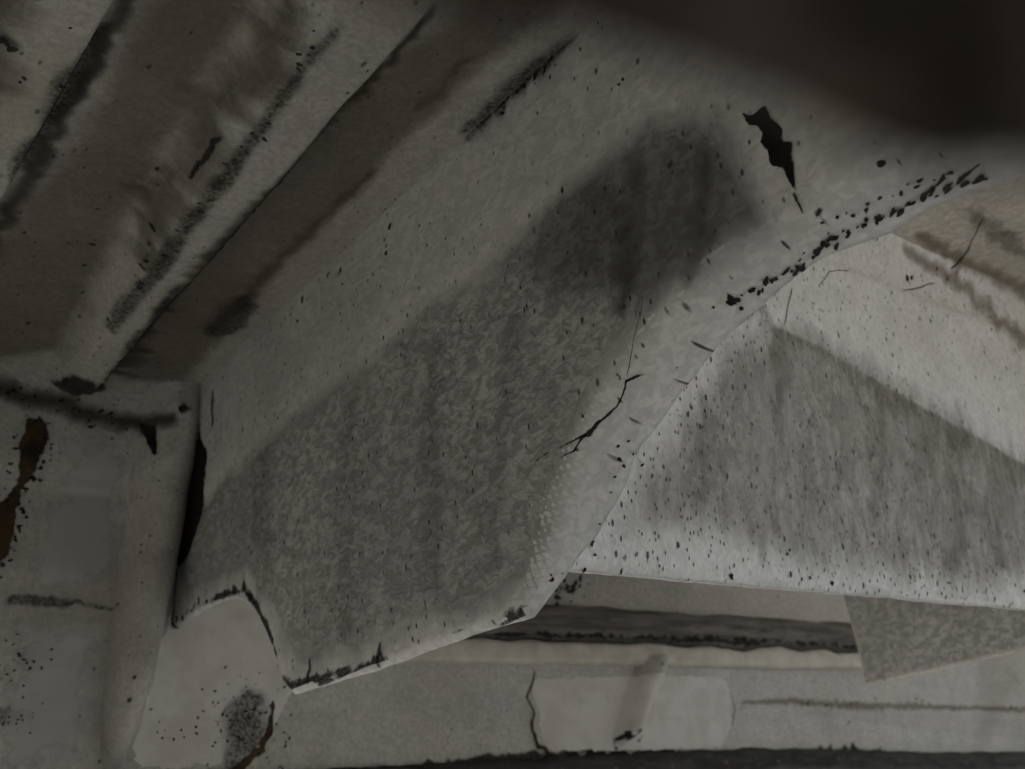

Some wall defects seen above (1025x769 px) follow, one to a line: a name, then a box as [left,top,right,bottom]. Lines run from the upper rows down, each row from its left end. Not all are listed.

damp [0,169,290,434]
damp [107,30,337,333]
damp [329,14,431,121]
damp [150,131,745,769]
damp [462,43,566,140]
crack [534,300,643,466]
damp [640,314,1025,681]
spalling [712,106,988,311]
crack [7,595,115,610]